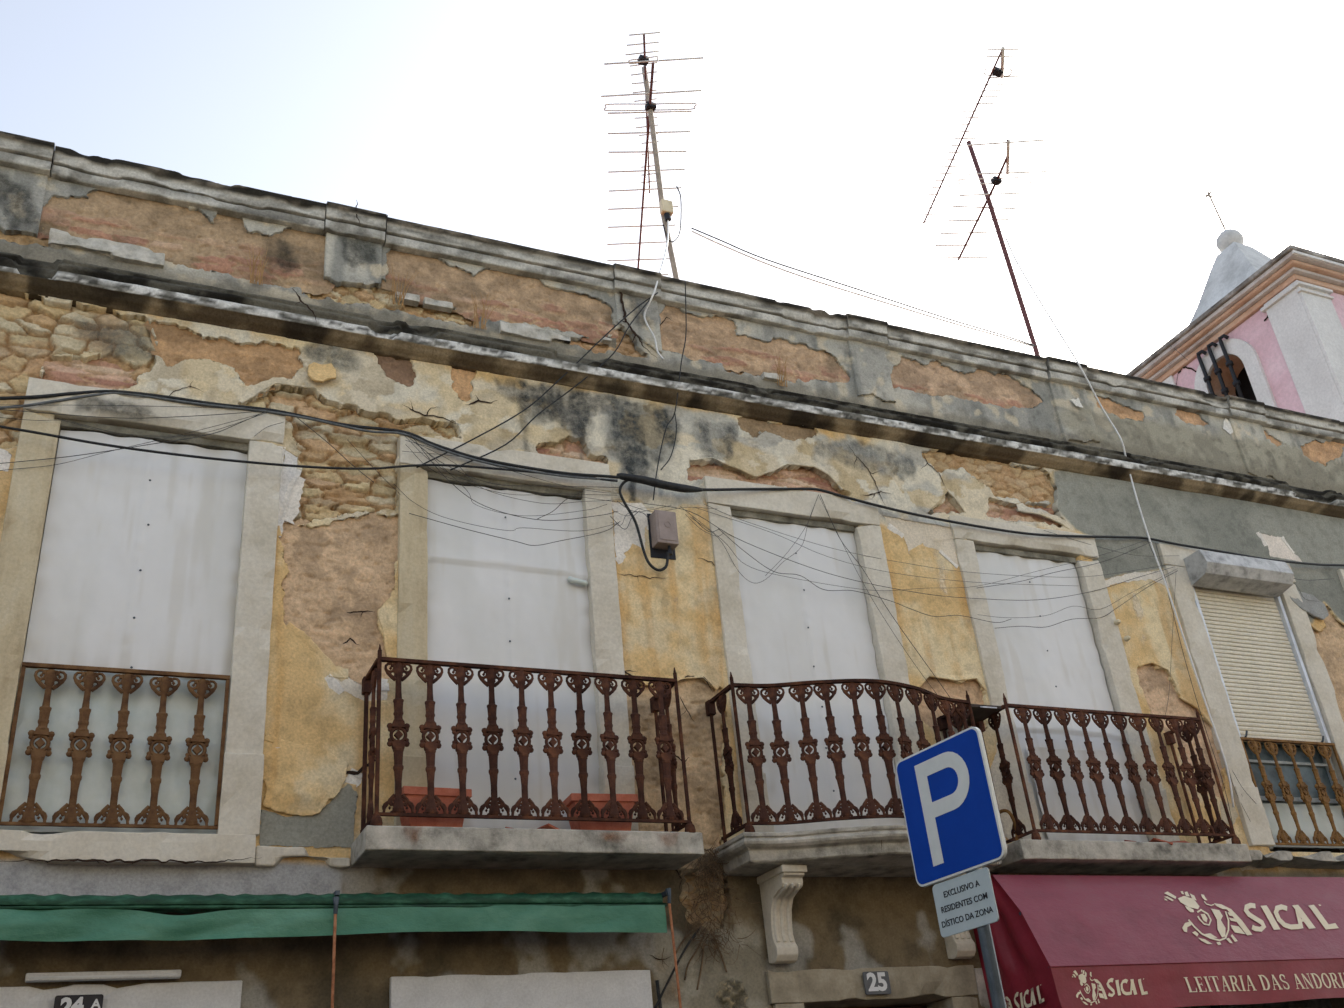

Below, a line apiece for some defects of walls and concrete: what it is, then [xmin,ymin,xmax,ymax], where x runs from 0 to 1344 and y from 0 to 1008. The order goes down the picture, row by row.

spalling [0,190,645,358]
water stain [513,381,678,500]
water stain [699,424,735,457]
spalling [659,306,850,383]
spalling [890,357,1042,409]
spalling [0,293,458,710]
peeling [611,494,652,564]
spalling [882,452,1070,569]
peeling [1105,570,1170,588]
spalling [1290,591,1344,722]
peeling [343,768,362,791]
spalling [625,672,728,931]